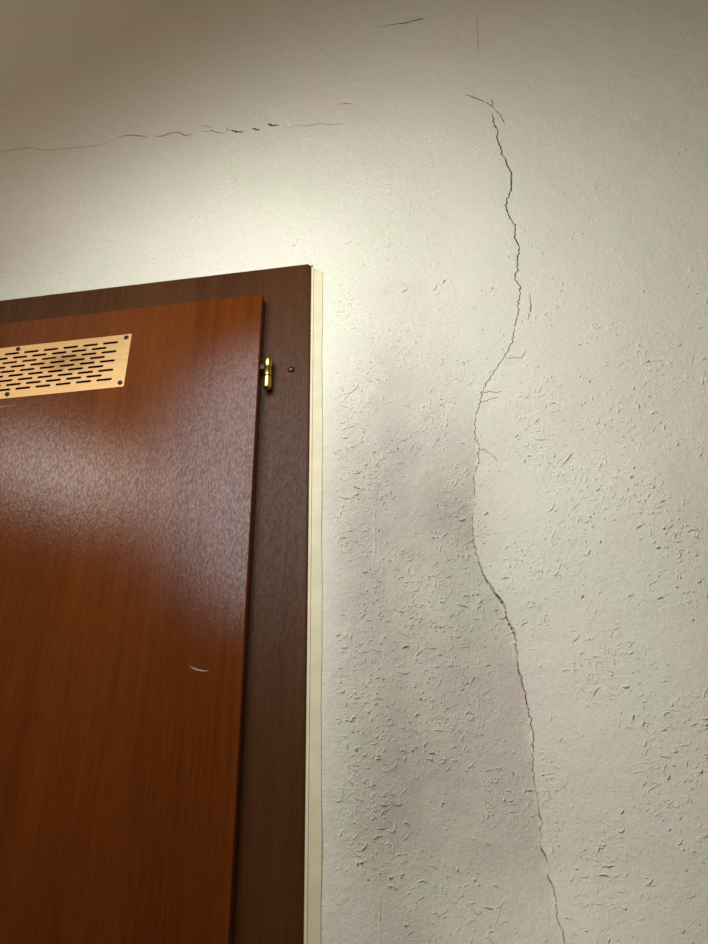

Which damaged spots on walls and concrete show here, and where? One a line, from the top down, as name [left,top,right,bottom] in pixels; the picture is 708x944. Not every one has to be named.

crack [468,95,565,942]